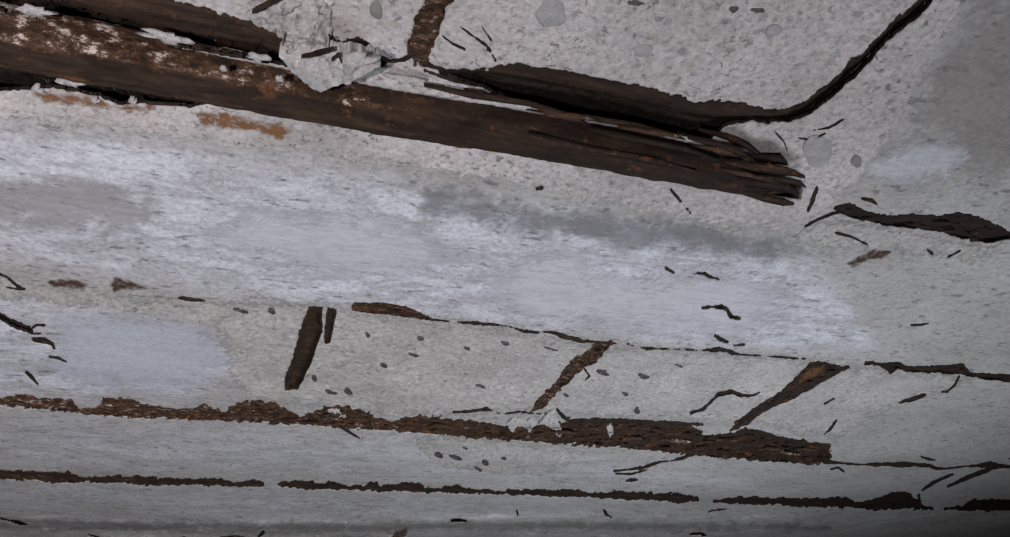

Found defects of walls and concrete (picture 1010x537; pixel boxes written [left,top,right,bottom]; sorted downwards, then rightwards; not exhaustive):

crack [381,0,933,151]
rust [36,93,152,110]
rust [197,113,287,139]
spalling [0,0,1010,266]
crack [665,266,720,280]
crack [426,304,829,361]
crack [690,389,760,415]
crack [824,398,837,435]
crack [823,456,1010,491]